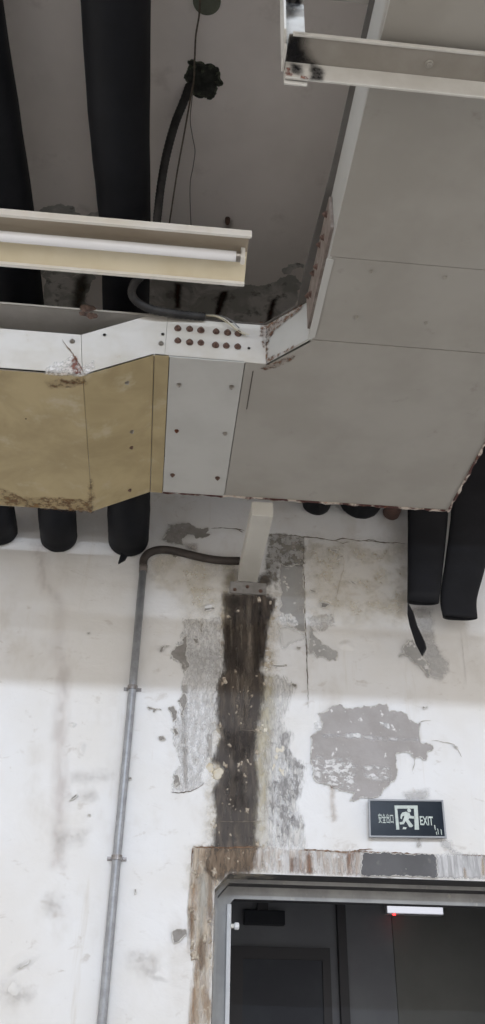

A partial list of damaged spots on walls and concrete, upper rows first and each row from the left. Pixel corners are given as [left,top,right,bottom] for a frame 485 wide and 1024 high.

flaking render [149,263,305,323]
peeling [162,522,211,545]
peeling [147,606,223,793]
leakage [205,594,276,886]
peeling [277,564,338,661]
crack [272,534,403,689]
peeling [258,664,434,848]
peeling [398,639,431,678]
leakage [437,841,485,878]